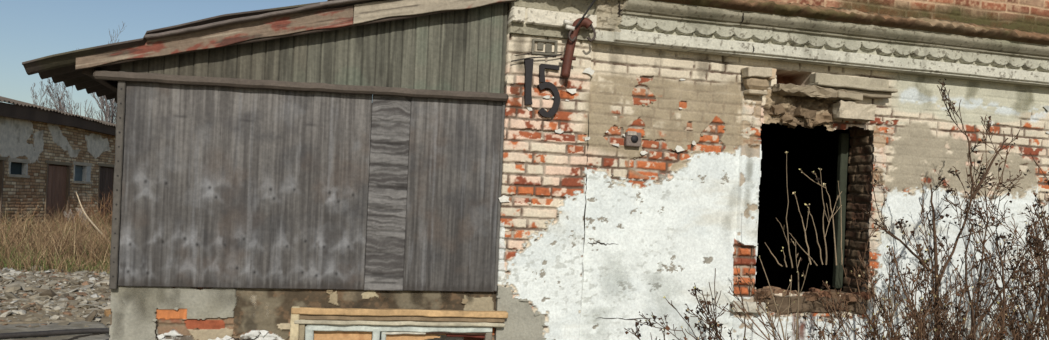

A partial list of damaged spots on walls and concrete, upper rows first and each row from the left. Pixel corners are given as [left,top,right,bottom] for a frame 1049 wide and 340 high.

peeling [0,116,110,164]
peeling [499,67,747,264]
peeling [878,84,1049,202]
peeling [649,254,684,292]
peeling [152,307,284,340]